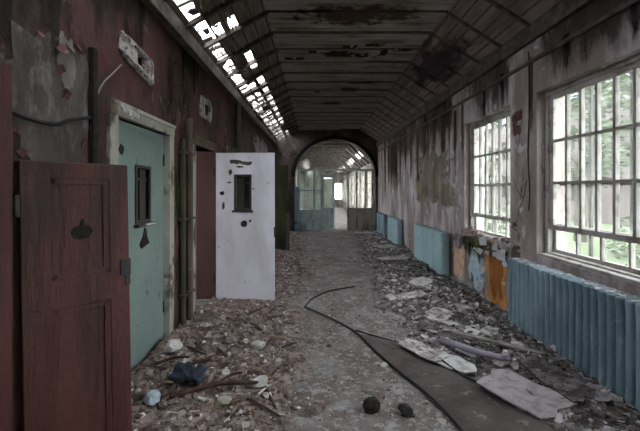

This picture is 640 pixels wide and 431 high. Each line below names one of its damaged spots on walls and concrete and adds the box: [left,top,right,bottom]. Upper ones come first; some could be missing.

water stain [542,0,640,74]
peeling [5,20,91,163]
water stain [381,98,463,204]
water stain [468,60,509,115]
peeling [510,109,522,136]
peeling [452,233,521,311]